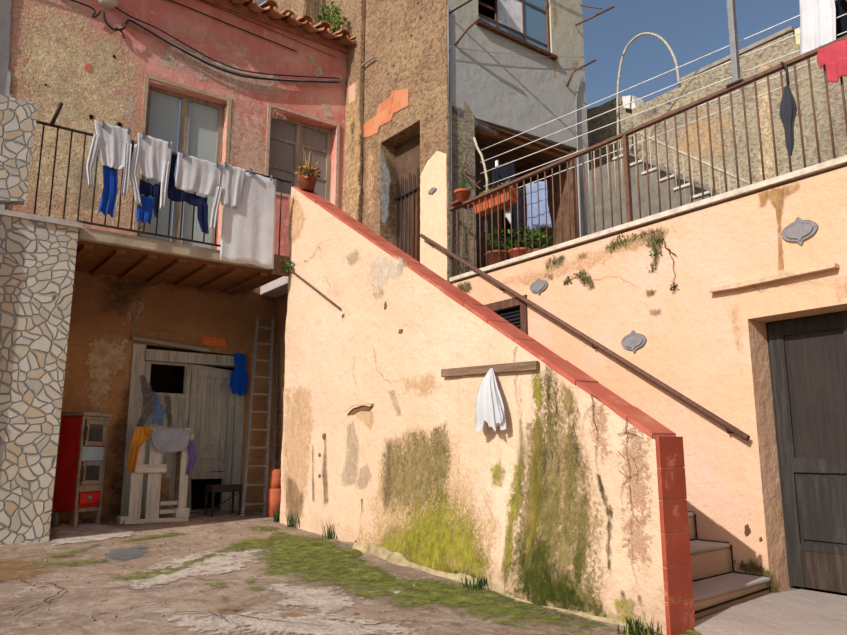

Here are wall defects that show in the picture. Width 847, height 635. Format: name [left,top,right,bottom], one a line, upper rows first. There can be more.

peeling [342,82,390,222]
rust [759,183,798,269]
peeling [85,300,144,411]
flaking render [342,402,374,489]
water stain [597,474,613,569]